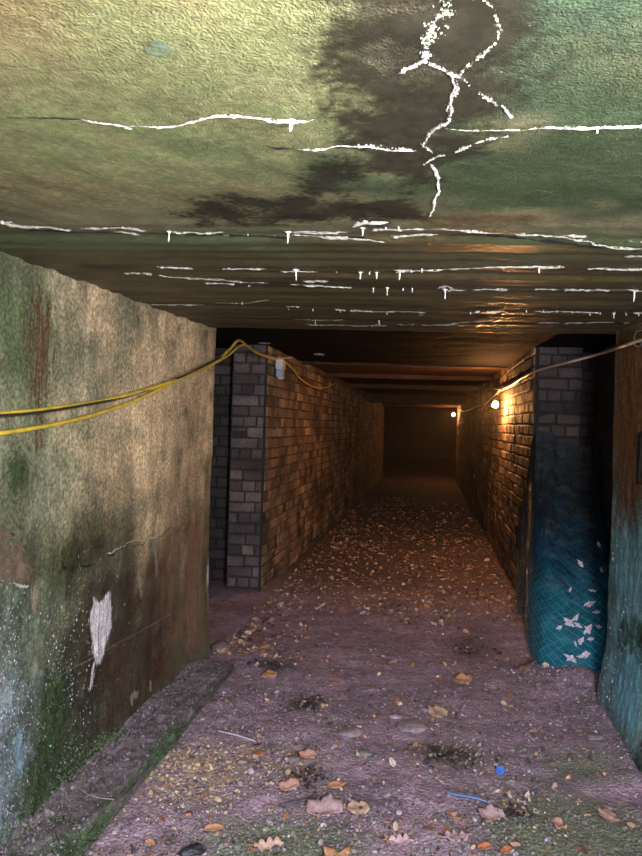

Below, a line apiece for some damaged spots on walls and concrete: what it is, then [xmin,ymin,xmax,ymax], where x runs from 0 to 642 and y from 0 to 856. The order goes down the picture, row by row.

crack [0,0,642,327]
water stain [170,0,543,227]
water stain [0,569,114,847]
water stain [598,520,642,748]